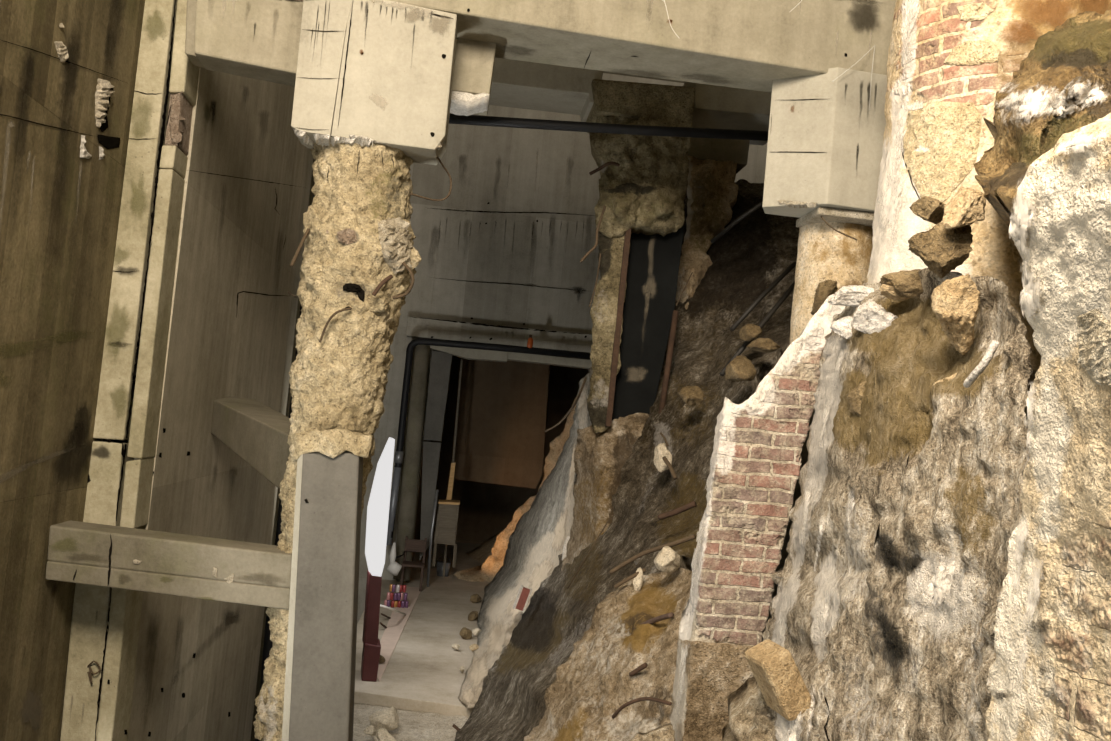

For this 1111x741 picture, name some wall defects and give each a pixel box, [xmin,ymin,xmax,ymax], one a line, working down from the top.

spalling [293,129,379,148]
spalling [326,228,357,244]
spalling [343,283,365,308]